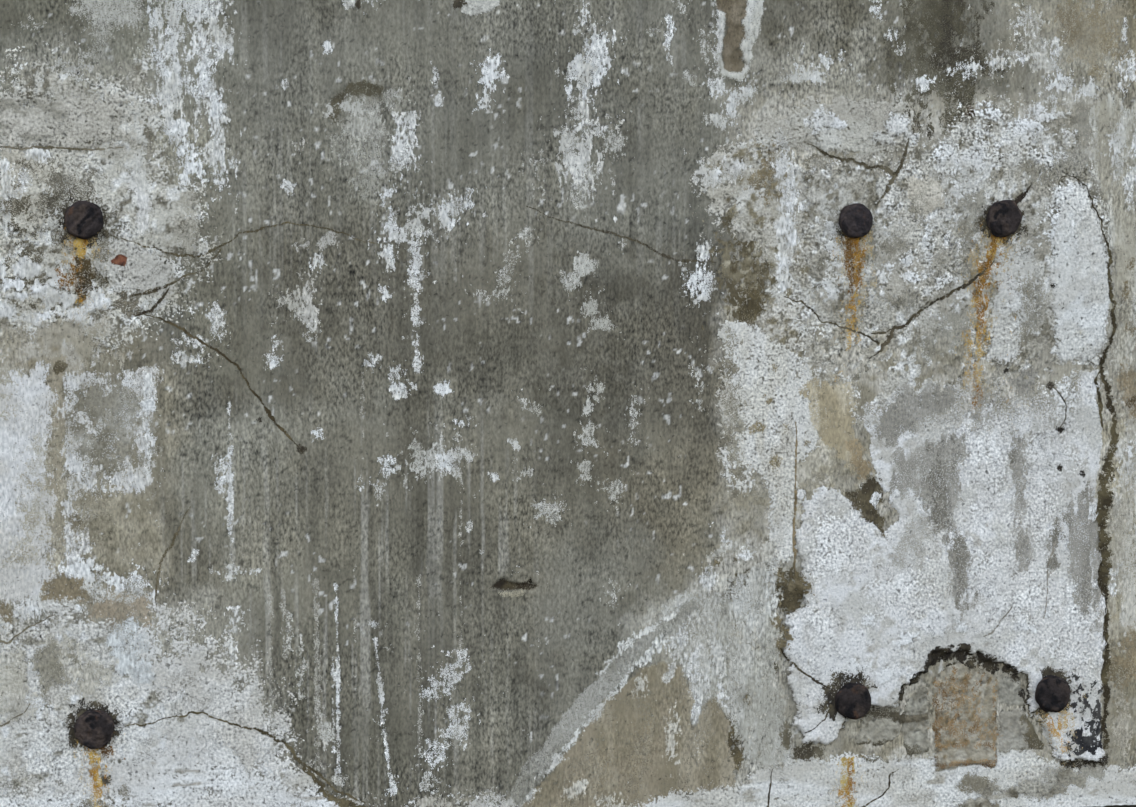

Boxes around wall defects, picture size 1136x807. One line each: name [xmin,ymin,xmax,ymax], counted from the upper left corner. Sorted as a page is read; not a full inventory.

crack [807,138,909,207]
crack [1015,185,1031,204]
corrosion [50,219,112,325]
crack [110,221,376,452]
corrosion [829,224,887,386]
crack [784,260,995,359]
corrosion [952,220,1023,431]
flaking render [401,0,1136,807]
crack [1058,175,1119,749]
corrosion [73,733,125,807]
crack [115,711,368,807]
corrosion [1033,693,1086,768]